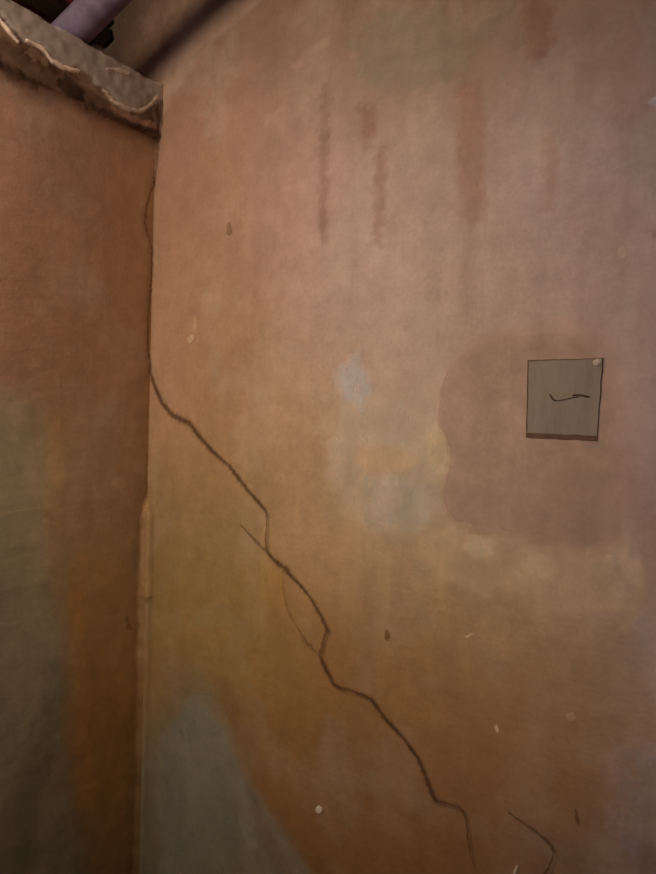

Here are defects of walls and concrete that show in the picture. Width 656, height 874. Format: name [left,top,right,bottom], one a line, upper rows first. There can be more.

peeling [0,0,163,137]
crack [144,114,475,869]
crack [508,812,554,874]